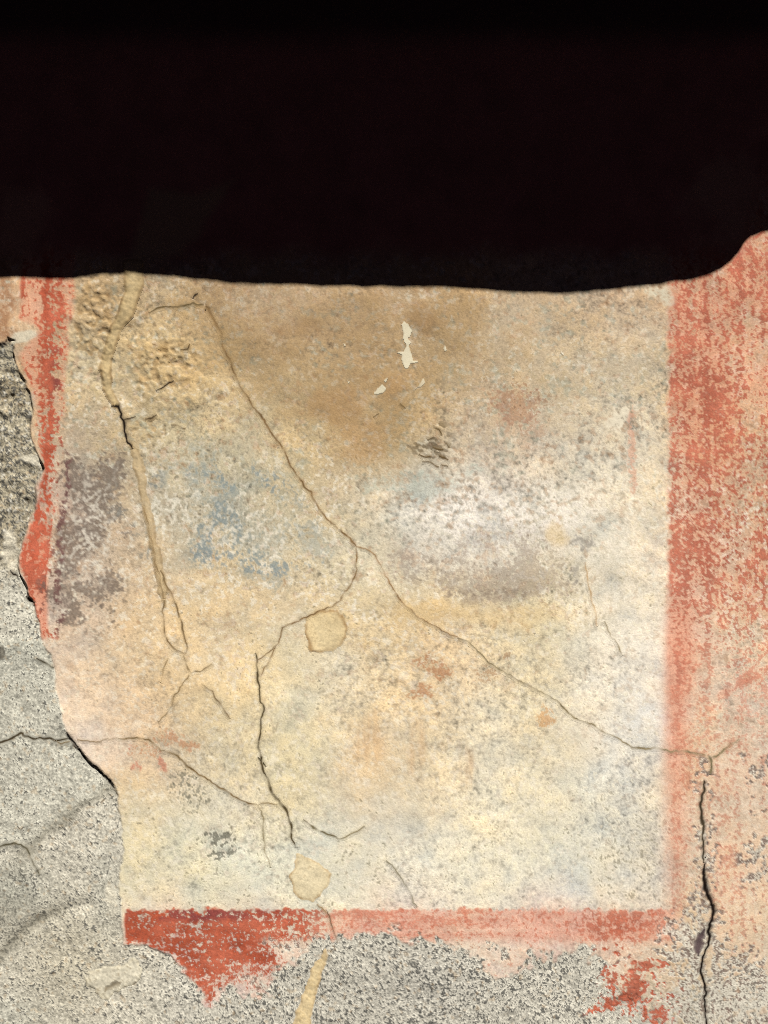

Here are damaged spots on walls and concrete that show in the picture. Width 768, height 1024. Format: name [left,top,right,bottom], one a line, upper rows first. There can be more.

flaking render [68,264,118,399]
flaking render [0,337,663,1024]
crack [0,291,741,1024]